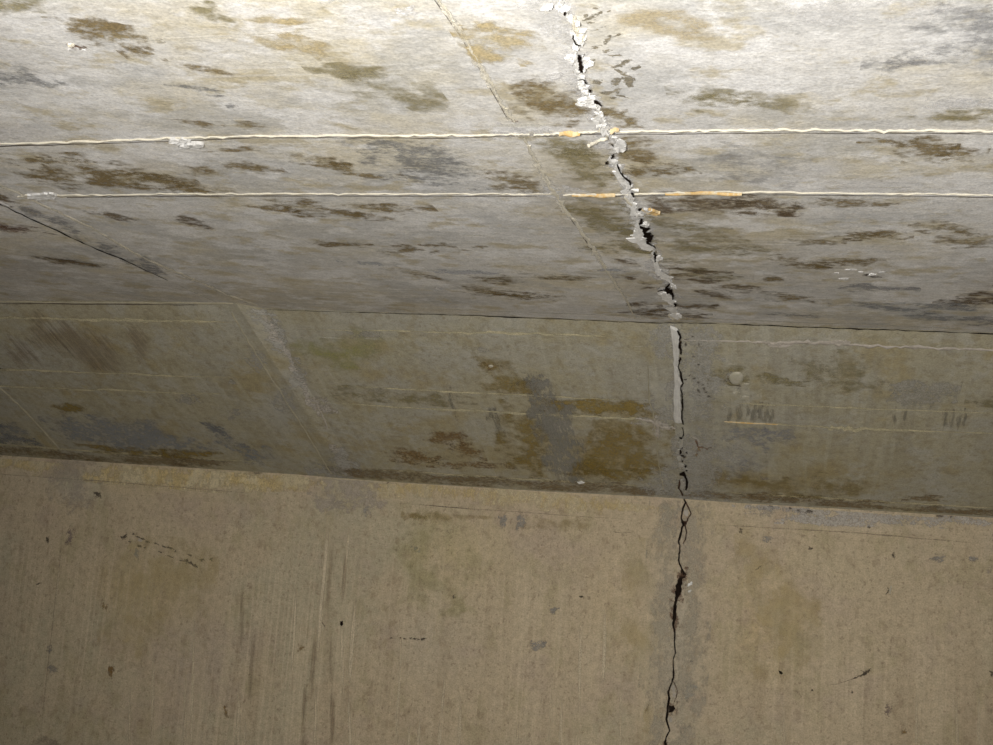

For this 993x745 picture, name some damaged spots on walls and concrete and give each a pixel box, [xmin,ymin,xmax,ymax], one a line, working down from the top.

water stain [68,18,153,58]
water stain [255,18,382,89]
water stain [450,23,531,63]
water stain [511,0,693,187]
water stain [23,146,284,193]
water stain [312,140,462,186]
water stain [856,136,977,157]
water stain [247,199,398,220]
water stain [564,193,804,319]
crack [267,0,993,745]
water stain [0,403,330,493]
water stain [343,372,670,513]